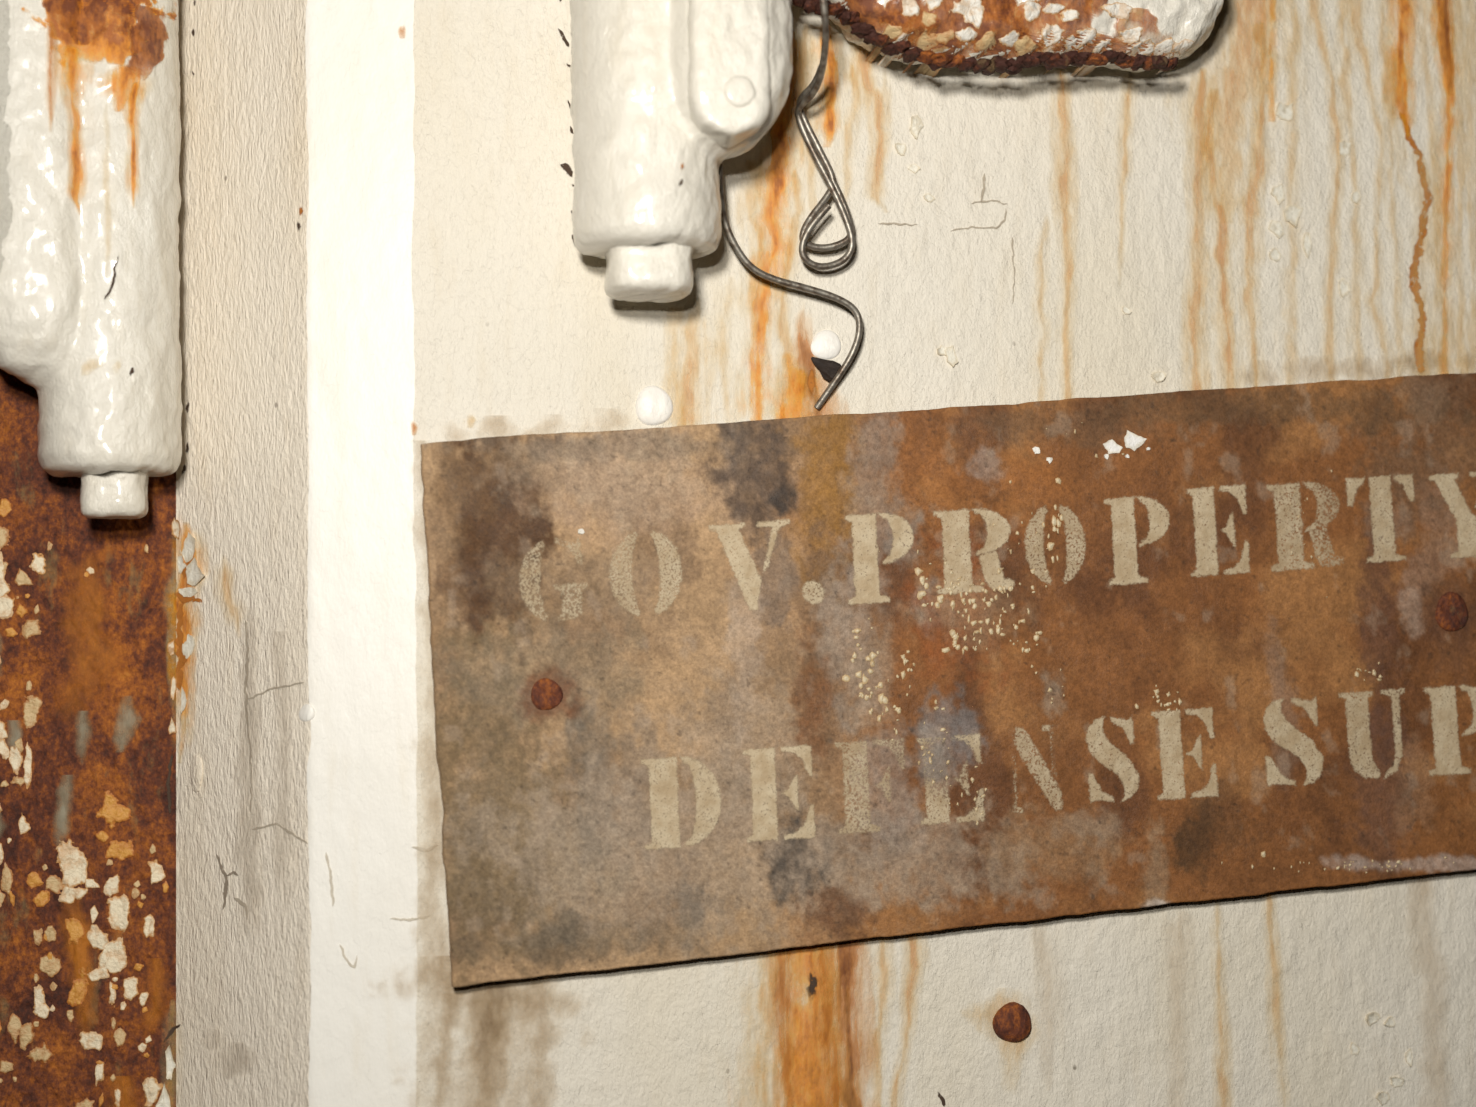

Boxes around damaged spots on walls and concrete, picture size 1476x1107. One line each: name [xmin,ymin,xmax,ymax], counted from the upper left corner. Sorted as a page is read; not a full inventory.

rust [1393,0,1413,133]
rust [1434,0,1455,279]
rust [751,33,827,420]
peeling [0,680,43,789]
peeling [0,498,53,639]
peeling [168,676,187,734]
peeling [167,634,195,659]
rust [174,529,196,716]
peeling [172,518,205,597]
peeling [0,790,176,1107]
leakage [472,980,514,1089]
rust [775,939,862,1107]